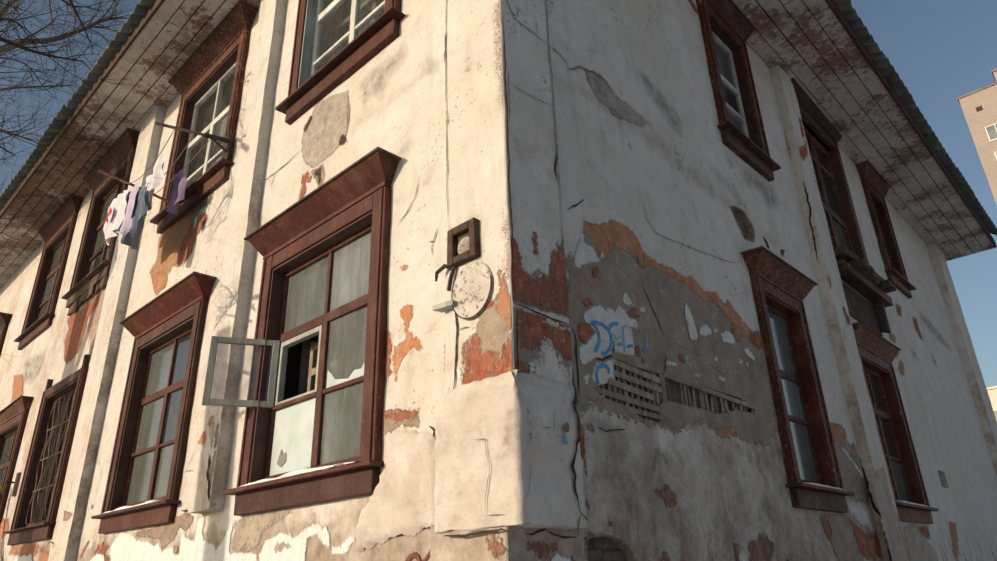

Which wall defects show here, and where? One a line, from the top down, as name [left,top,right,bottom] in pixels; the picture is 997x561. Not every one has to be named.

spalling [567,65,649,126]
spalling [298,90,351,201]
peeling [150,193,214,296]
crack [444,0,589,539]
crack [635,179,737,263]
crack [803,182,818,261]
peeling [63,294,100,364]
peeling [384,304,422,385]
peeling [457,220,779,476]
peeling [80,508,355,561]
spalling [527,520,638,561]
crack [859,457,892,561]